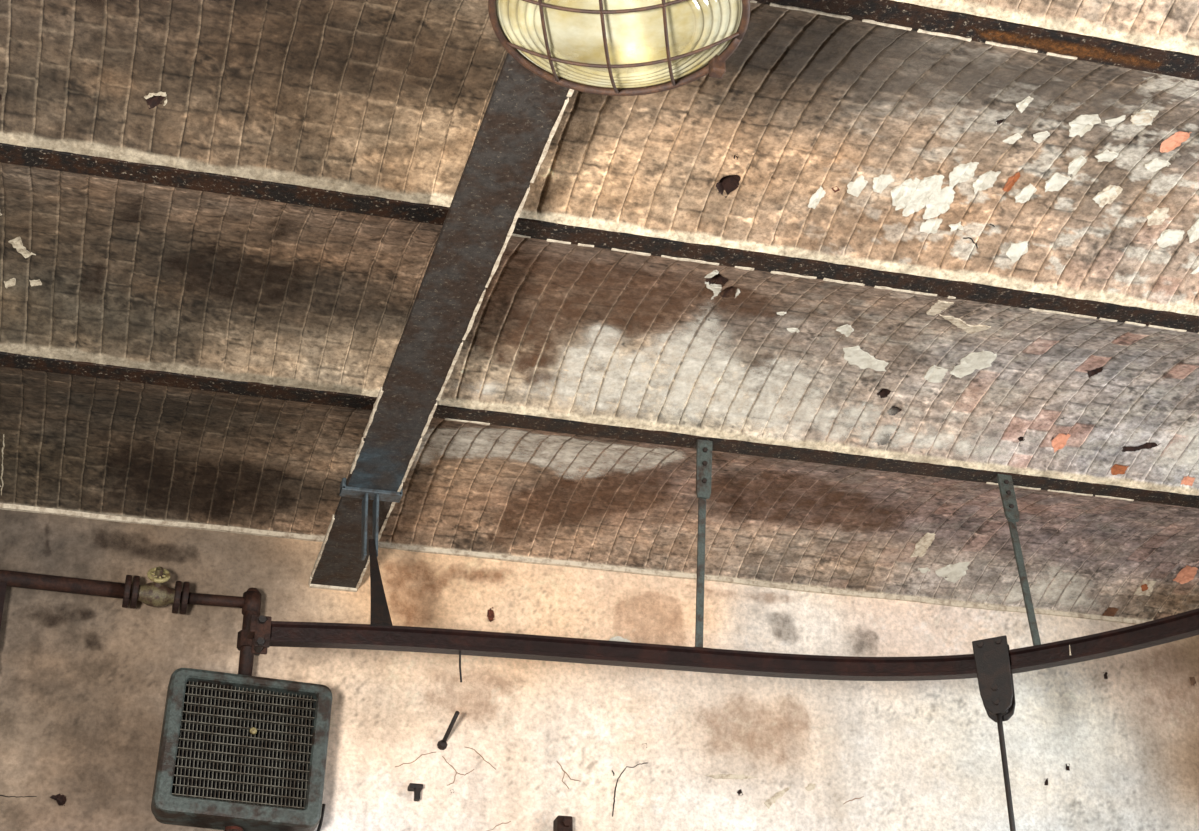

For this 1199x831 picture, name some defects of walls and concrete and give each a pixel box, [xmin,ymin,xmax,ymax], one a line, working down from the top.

peeling [1003,131,1050,144]
peeling [1069,109,1159,137]
flaking render [1145,131,1192,172]
peeling [808,150,1123,234]
peeling [8,237,36,258]
peeling [1147,207,1199,248]
damp [475,252,969,451]
peeling [836,324,889,371]
peeling [924,350,997,383]
spalling [1111,442,1159,475]
damp [414,428,683,541]
damp [714,472,903,530]